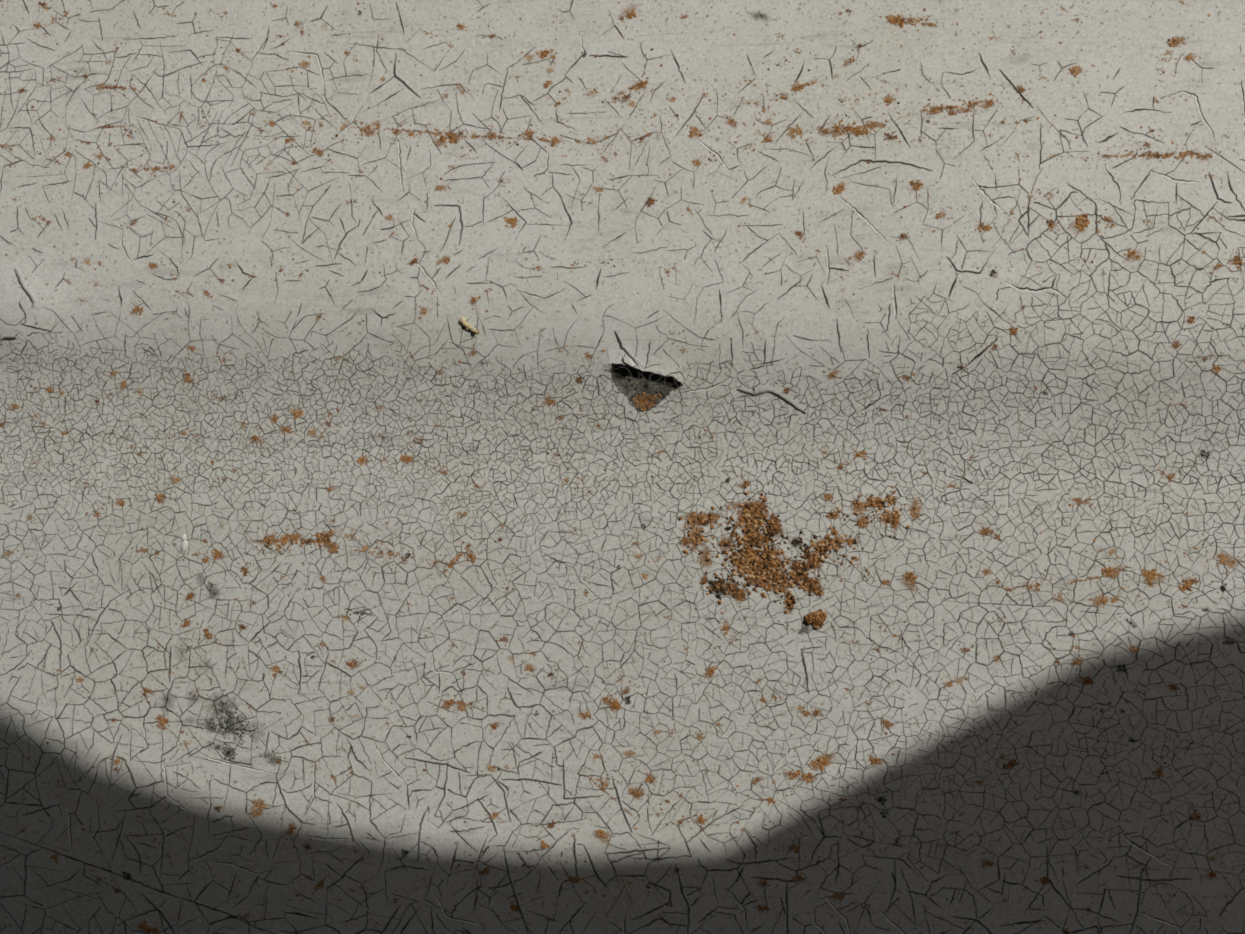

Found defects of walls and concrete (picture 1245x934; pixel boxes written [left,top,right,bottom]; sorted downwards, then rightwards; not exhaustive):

rust [0,0,1245,380]
crack [0,0,1245,414]
spalling [611,356,683,413]
rust [818,445,878,473]
crack [0,535,174,684]
rust [0,328,526,759]
crack [212,621,329,695]
crack [381,606,535,696]
crack [801,610,904,694]
rust [845,673,926,765]
rust [592,463,1244,718]
crack [2,724,1228,934]